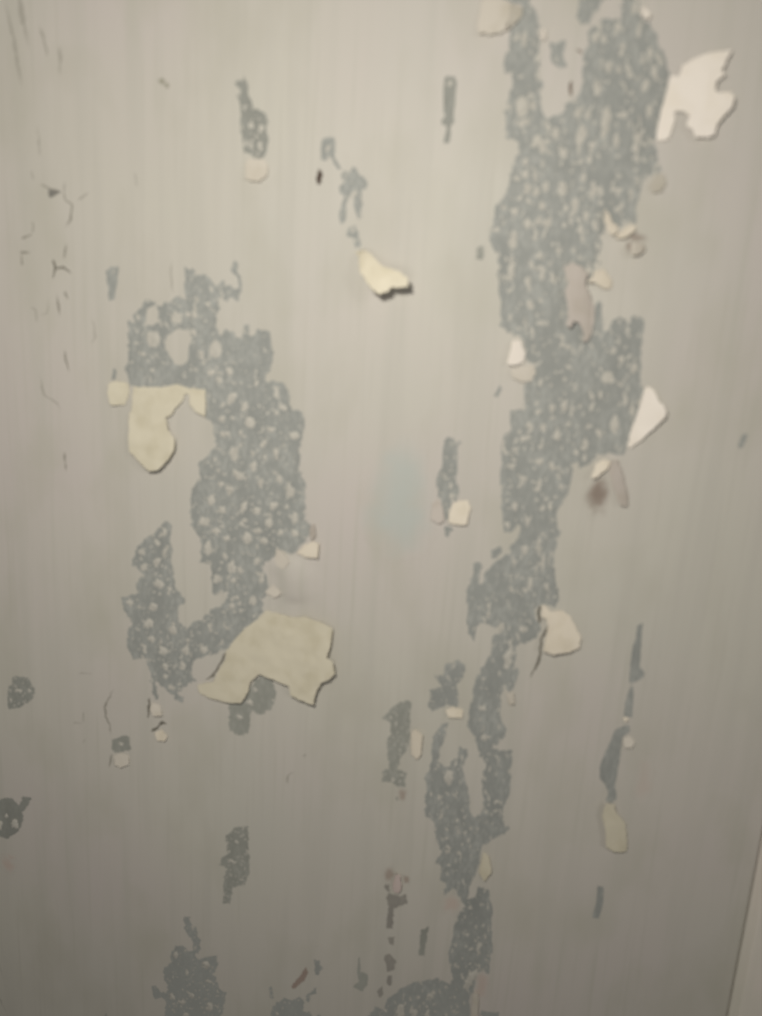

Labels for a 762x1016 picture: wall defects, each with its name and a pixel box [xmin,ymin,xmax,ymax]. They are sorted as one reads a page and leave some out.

peeling [235,77,269,182]
peeling [321,137,409,294]
peeling [105,260,335,736]
peeling [370,0,735,1016]
peeling [7,676,35,709]
peeling [0,797,32,839]
peeling [219,826,250,904]
peeling [151,917,227,1016]
peeling [269,959,323,1016]